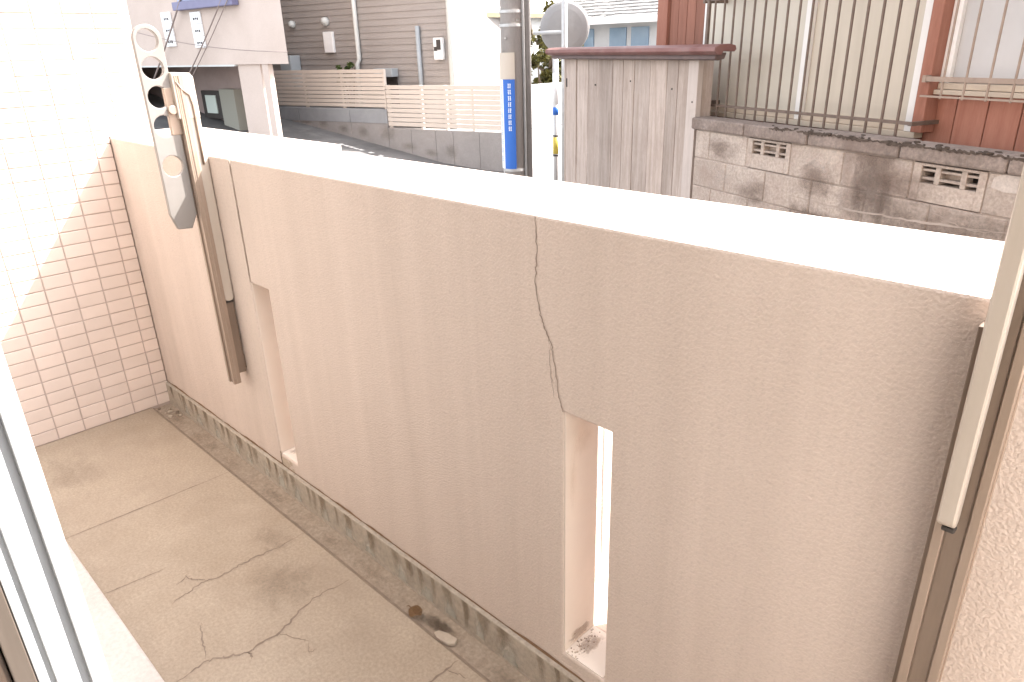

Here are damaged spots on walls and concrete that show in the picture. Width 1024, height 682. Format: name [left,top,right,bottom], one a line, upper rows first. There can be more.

crack [534,217,563,412]
crack [175,533,304,601]
crack [177,580,348,682]